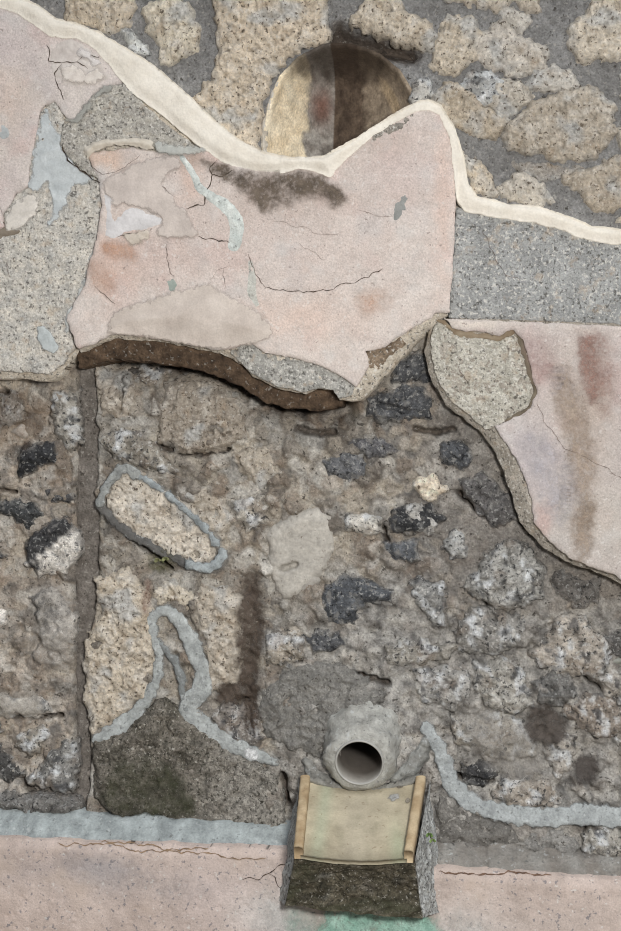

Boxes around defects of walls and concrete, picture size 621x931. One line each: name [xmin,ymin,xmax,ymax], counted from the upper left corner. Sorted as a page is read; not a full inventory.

crack [47,46,99,97]
flaking render [0,39,355,412]
crack [180,155,382,307]
flaking render [430,320,537,429]
crack [537,404,621,478]
damp [217,574,264,732]
crack [59,840,285,888]
crack [441,869,551,877]
damp [306,911,437,931]